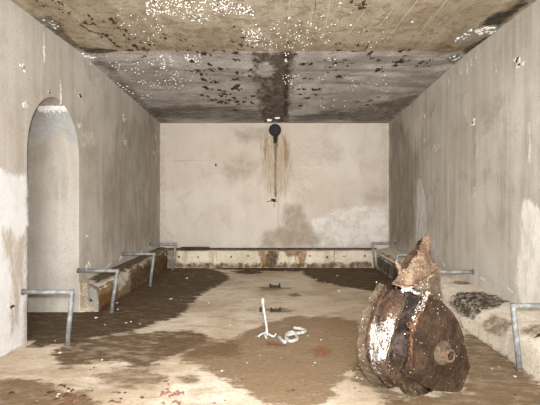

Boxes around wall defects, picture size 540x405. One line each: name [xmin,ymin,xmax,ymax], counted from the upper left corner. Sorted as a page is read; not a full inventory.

water stain [447,0,528,75]
water stain [33,81,97,147]
water stain [253,51,294,122]
rust [259,251,279,266]
water stain [0,167,540,405]